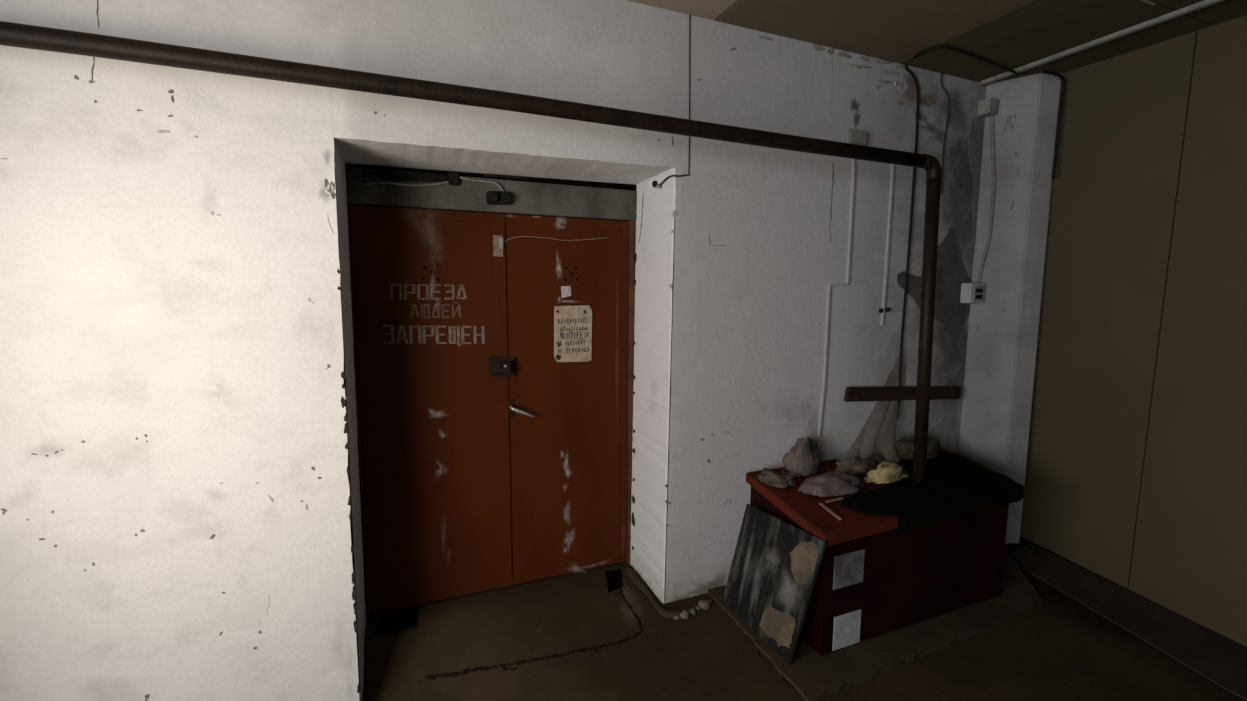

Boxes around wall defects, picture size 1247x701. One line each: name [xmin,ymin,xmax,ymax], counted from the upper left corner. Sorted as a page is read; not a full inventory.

crack [88,0,99,82]
water stain [940,326,968,405]